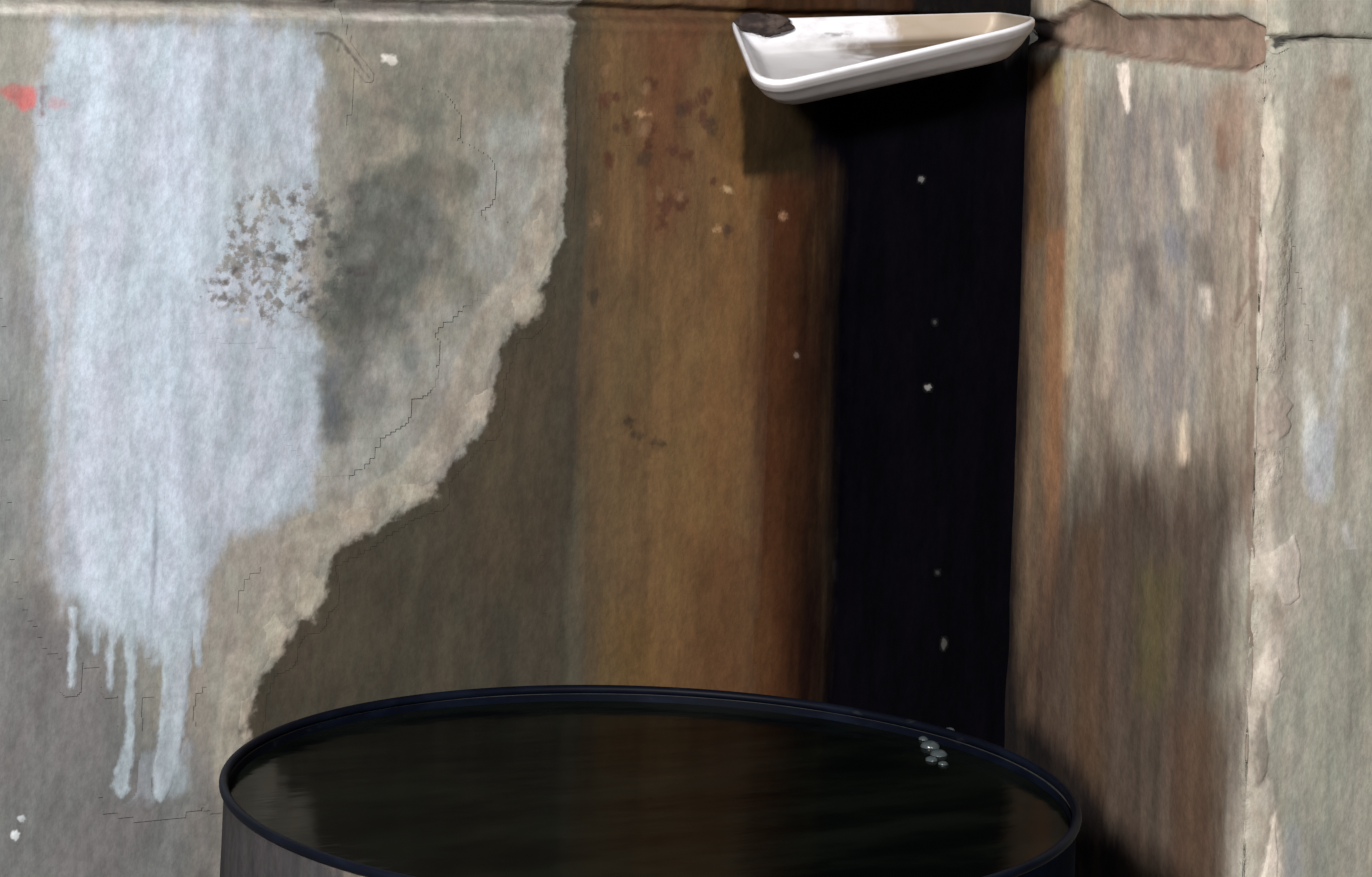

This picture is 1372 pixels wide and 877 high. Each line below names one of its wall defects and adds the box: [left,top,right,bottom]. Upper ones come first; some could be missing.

peeling [167,152,386,353]
water stain [35,13,578,830]
crack [311,28,374,82]
spalling [1057,0,1301,877]
water stain [1039,40,1372,877]
crack [1266,29,1372,54]